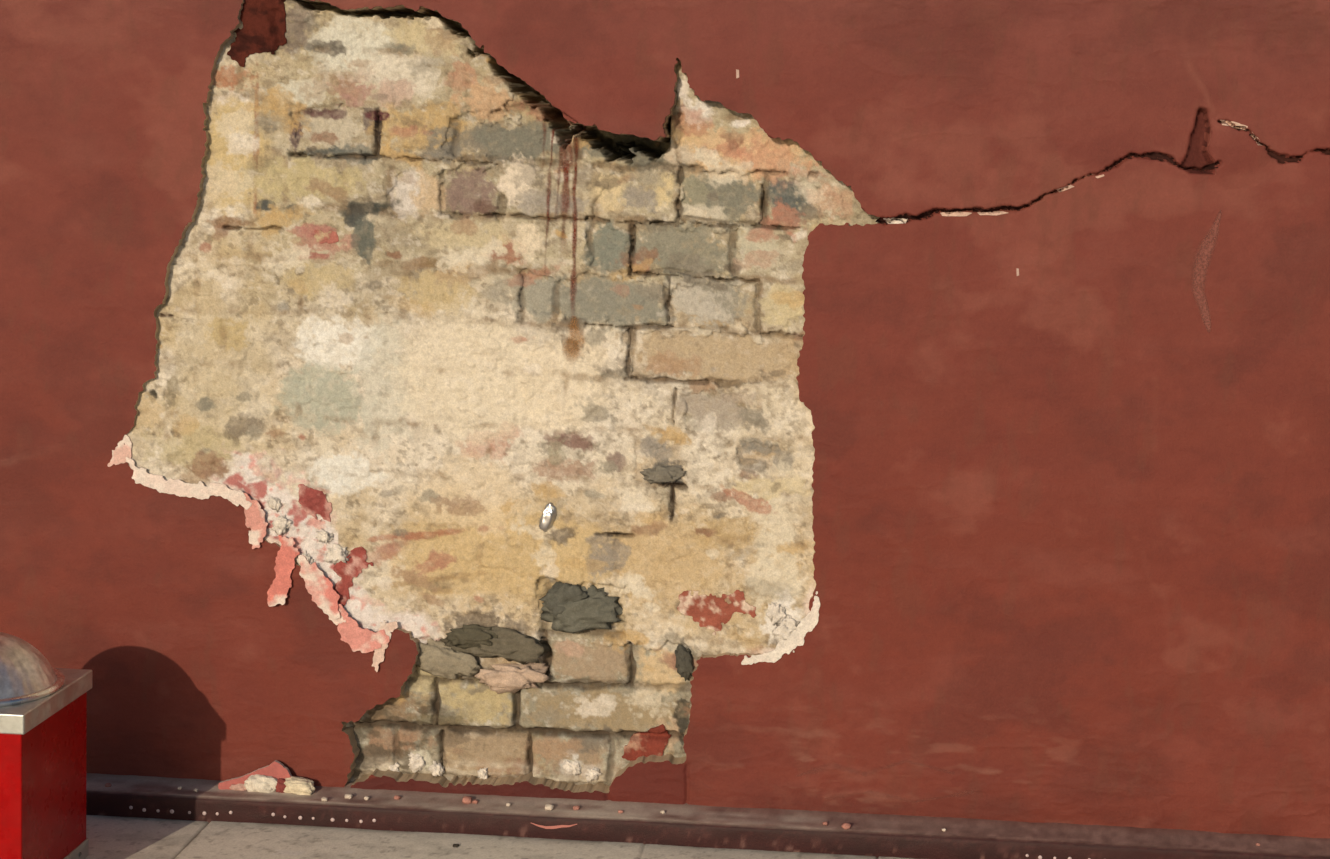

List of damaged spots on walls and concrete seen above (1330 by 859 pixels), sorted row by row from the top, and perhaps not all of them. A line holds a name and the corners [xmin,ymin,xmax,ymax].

crack [1217,120,1330,164]
crack [875,152,1220,224]
spalling [107,0,880,786]